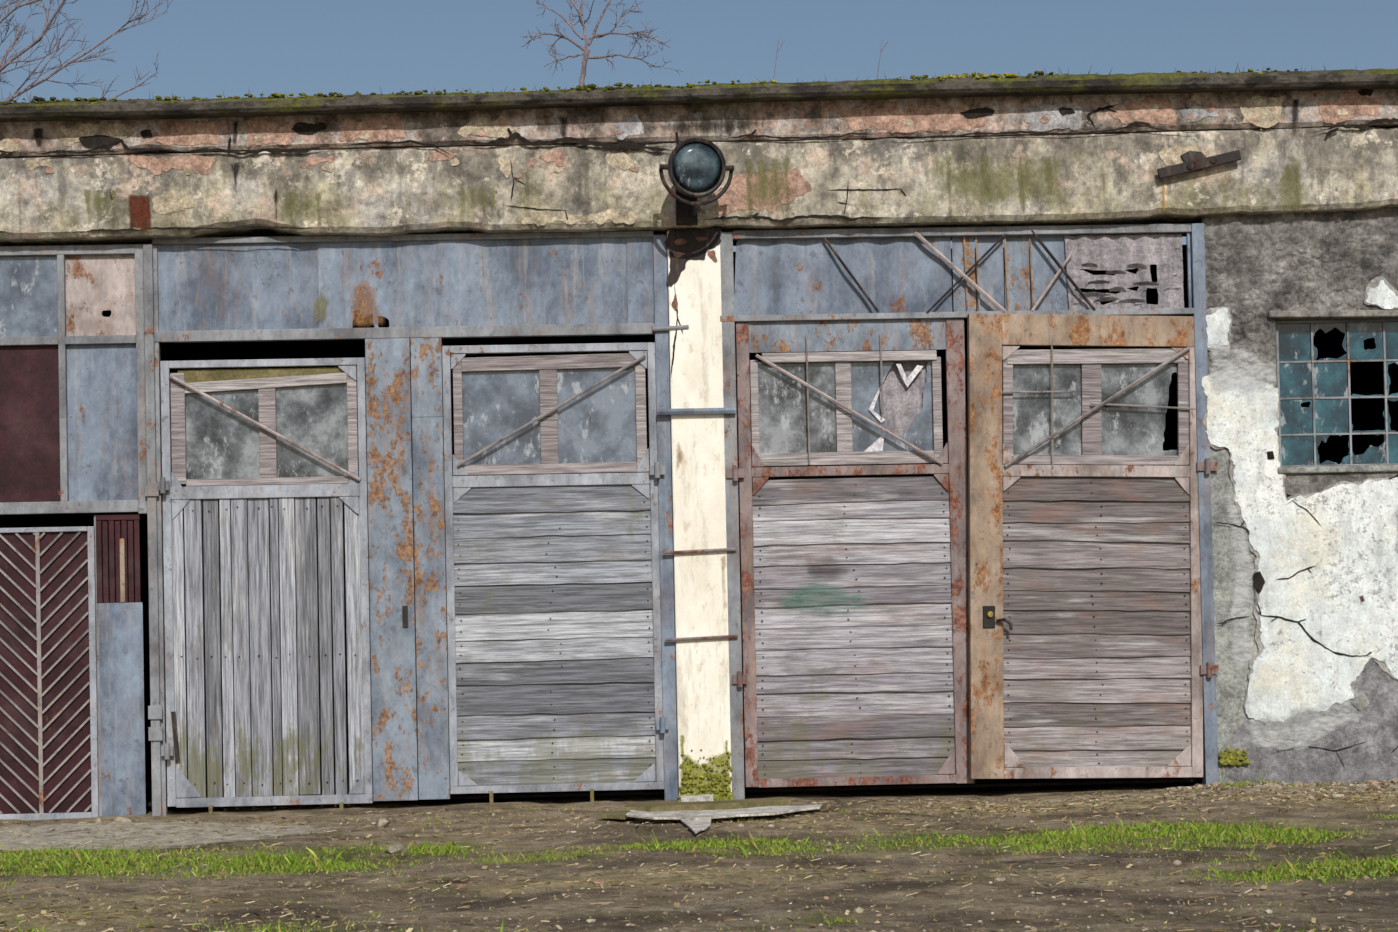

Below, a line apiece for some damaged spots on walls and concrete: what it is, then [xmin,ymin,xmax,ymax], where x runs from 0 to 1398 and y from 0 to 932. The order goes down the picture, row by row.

crack [1315,118,1398,137]
crack [0,128,671,220]
peeling [665,168,812,310]
corrosion [352,283,380,324]
spalling [1201,207,1398,388]
crack [1217,566,1372,657]
spalling [1210,447,1398,784]
crack [1274,741,1398,768]